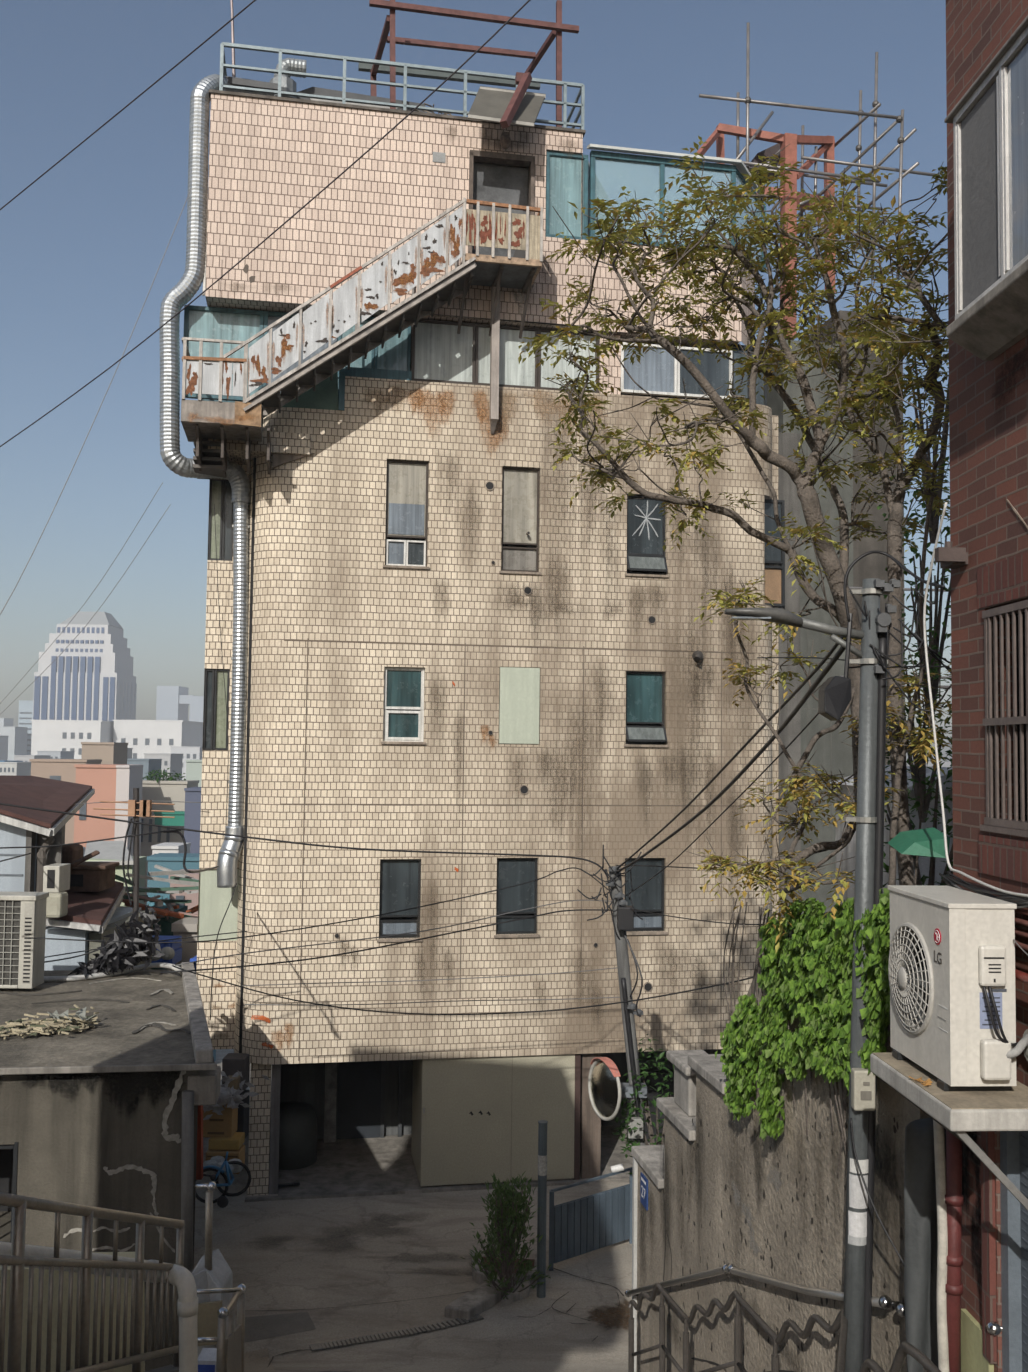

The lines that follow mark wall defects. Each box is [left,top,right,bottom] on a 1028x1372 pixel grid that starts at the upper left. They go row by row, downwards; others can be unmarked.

corrosion [330,266,363,288]
crack [0,977,191,1034]
water stain [22,1071,183,1114]
crack [161,1071,186,1143]
crack [63,1164,175,1253]